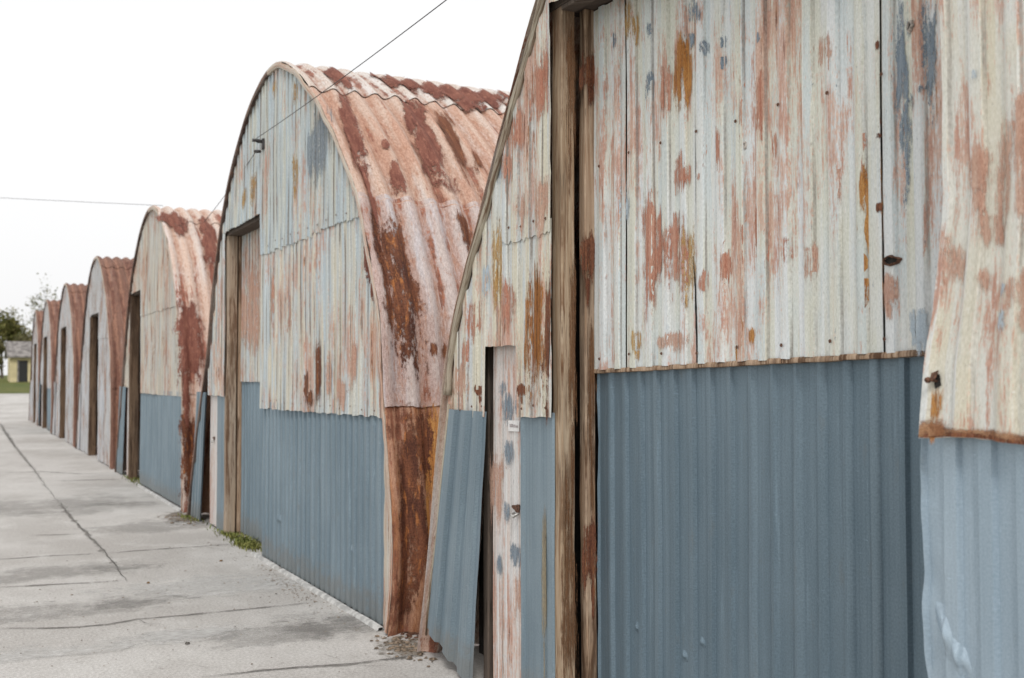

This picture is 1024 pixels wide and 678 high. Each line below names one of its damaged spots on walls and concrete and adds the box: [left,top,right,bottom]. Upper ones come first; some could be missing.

rust [156,210,218,282]
rust [172,298,205,499]
rust [320,66,447,381]
rust [370,41,549,192]
peeling [688,0,727,69]
peeling [891,0,937,210]
peeling [909,308,929,356]
rust [939,237,966,284]
rust [918,389,1024,445]
rust [969,93,1024,247]
rust [1002,268,1024,332]
rust [395,403,440,615]